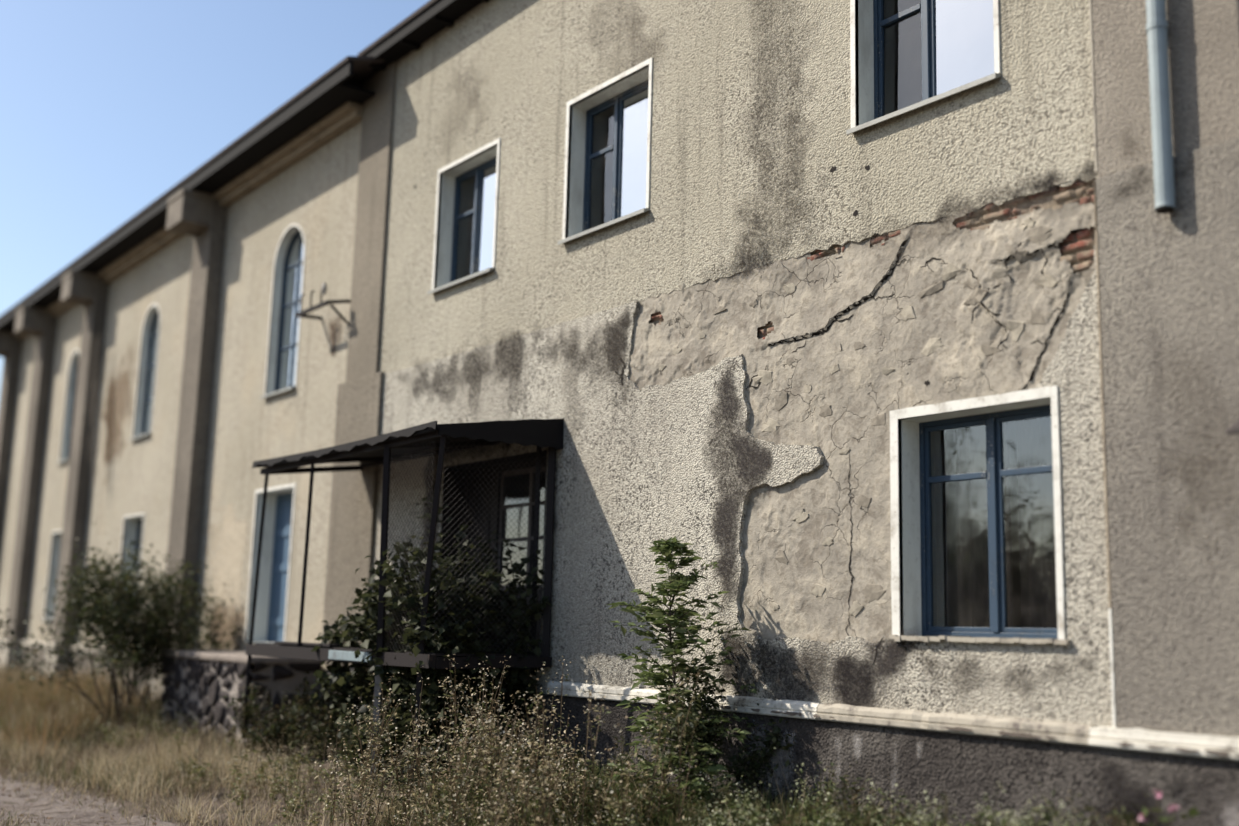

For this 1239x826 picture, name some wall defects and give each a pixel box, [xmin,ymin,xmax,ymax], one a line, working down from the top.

damp [414,312,630,398]
damp [706,368,771,611]
flaking render [629,178,1096,644]
crack [845,447,886,668]
crack [746,217,1074,390]
damp [722,633,911,706]